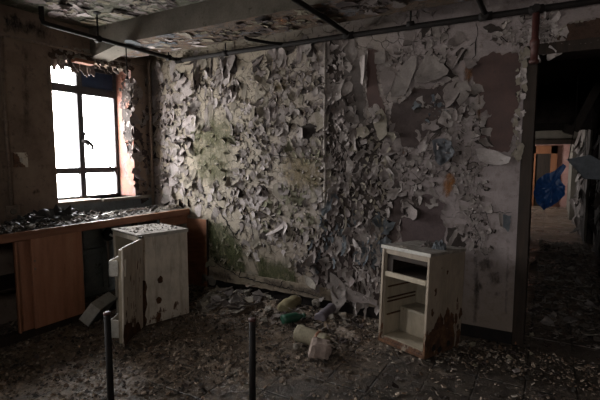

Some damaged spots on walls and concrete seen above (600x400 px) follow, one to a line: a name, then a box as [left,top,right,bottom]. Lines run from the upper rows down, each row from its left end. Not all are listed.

leakage [208,220,245,280]
flaking render [24,0,600,318]